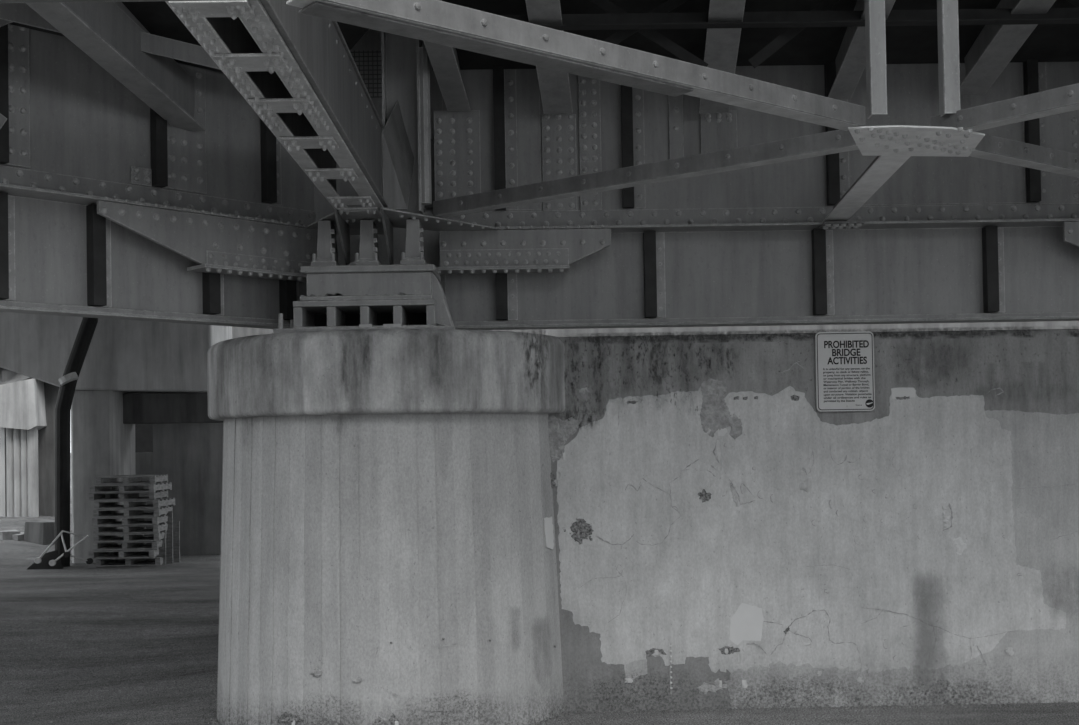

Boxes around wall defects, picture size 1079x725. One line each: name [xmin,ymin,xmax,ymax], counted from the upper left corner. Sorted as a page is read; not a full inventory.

peeling [700,378,758,470]
peeling [548,415,581,488]
spalling [698,480,712,503]
spalling [563,518,594,544]
crack [581,440,755,623]
crack [747,608,1018,666]
peeling [645,648,666,656]
peeling [719,646,741,663]
peeling [696,678,748,694]
spalling [275,712,356,725]